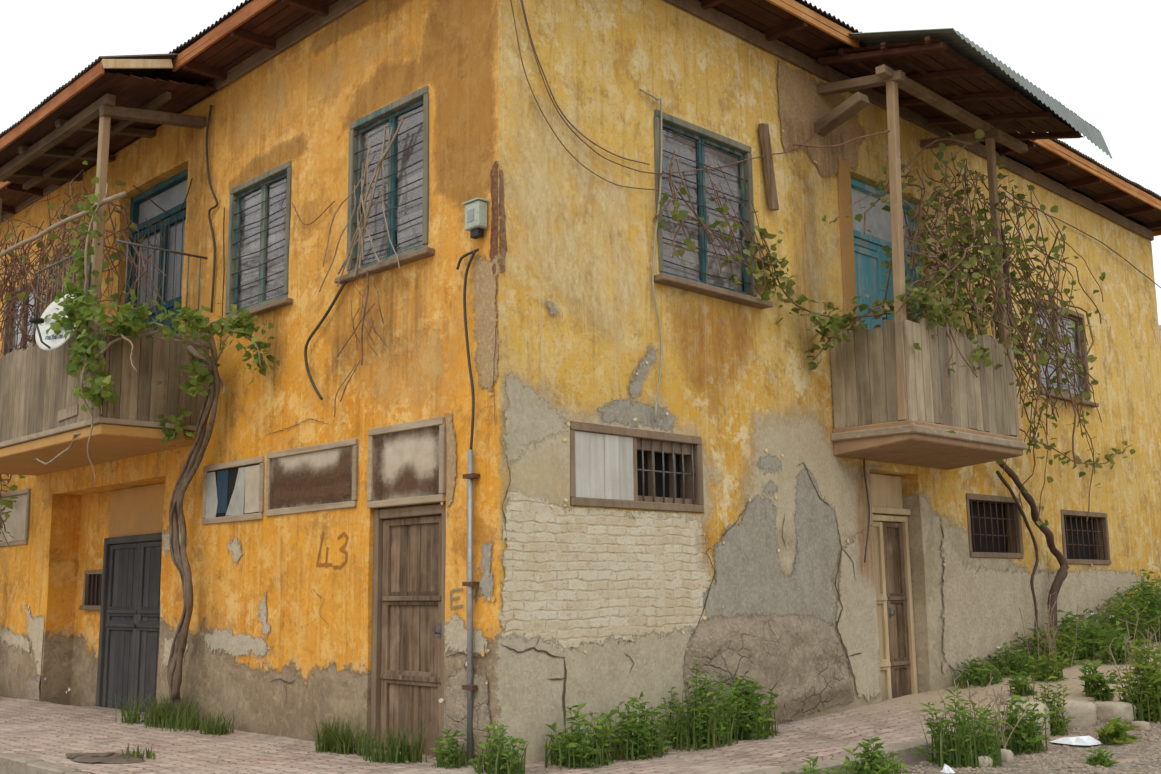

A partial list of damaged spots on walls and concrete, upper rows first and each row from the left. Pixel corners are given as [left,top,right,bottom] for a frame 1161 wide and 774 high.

peeling [440,411,457,518]
spalling [472,160,884,701]
peeling [0,602,46,701]
peeling [161,587,275,671]
peeling [227,537,244,566]
spalling [439,612,498,757]
crack [443,638,567,724]
peeling [941,518,1149,674]